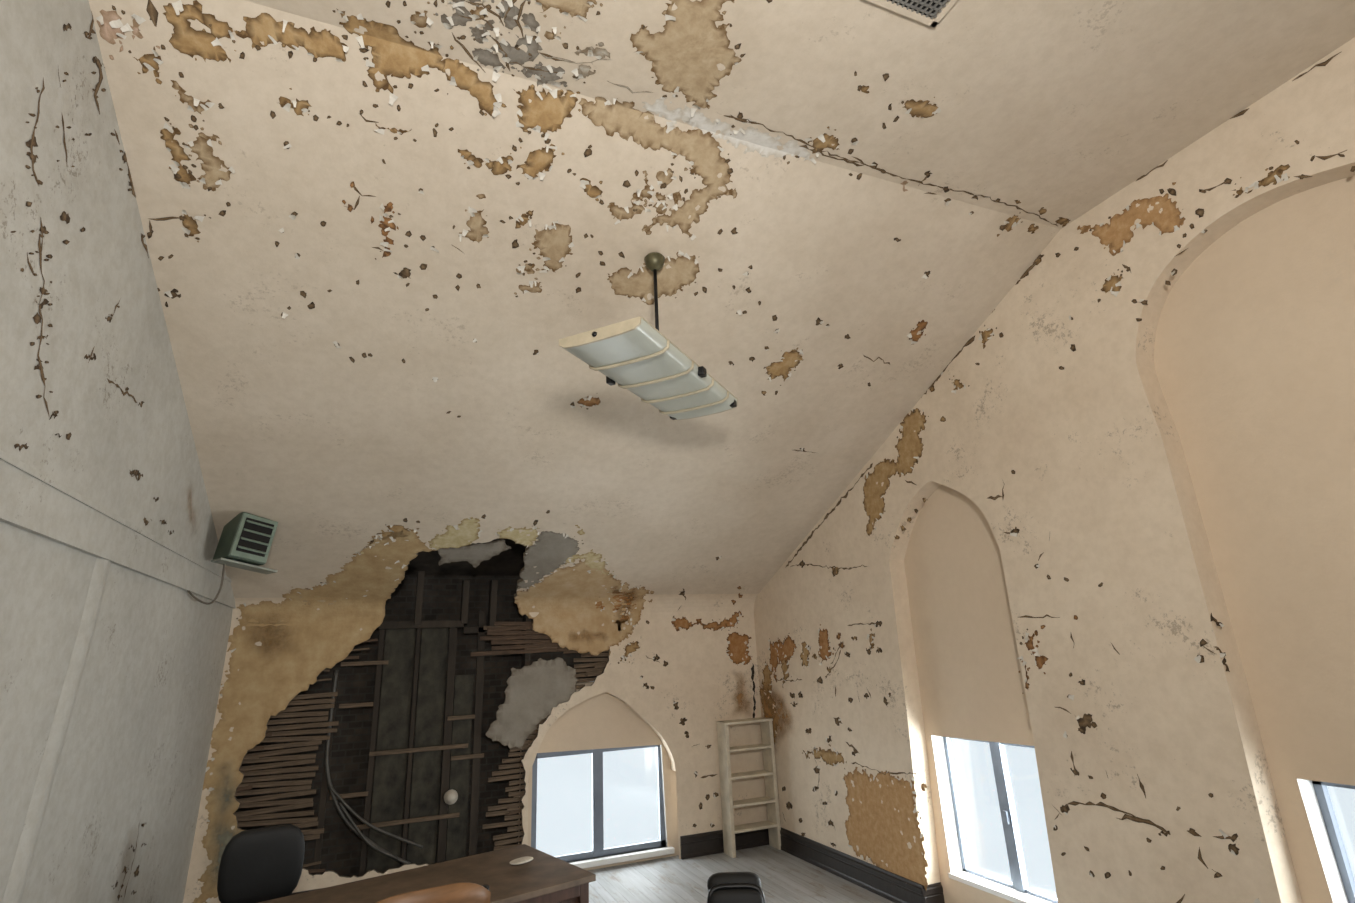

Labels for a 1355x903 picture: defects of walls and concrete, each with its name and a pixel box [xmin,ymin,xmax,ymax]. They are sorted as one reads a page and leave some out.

peeling [63,0,840,307]
crack [724,115,1058,226]
crack [1020,254,1044,279]
peeling [997,150,1355,322]
peeling [729,315,803,396]
crack [912,336,975,413]
crack [786,463,873,567]
peeling [863,408,946,539]
peeling [192,510,668,903]
peeling [673,701,711,749]
peeling [726,621,891,734]
peeling [802,717,928,890]